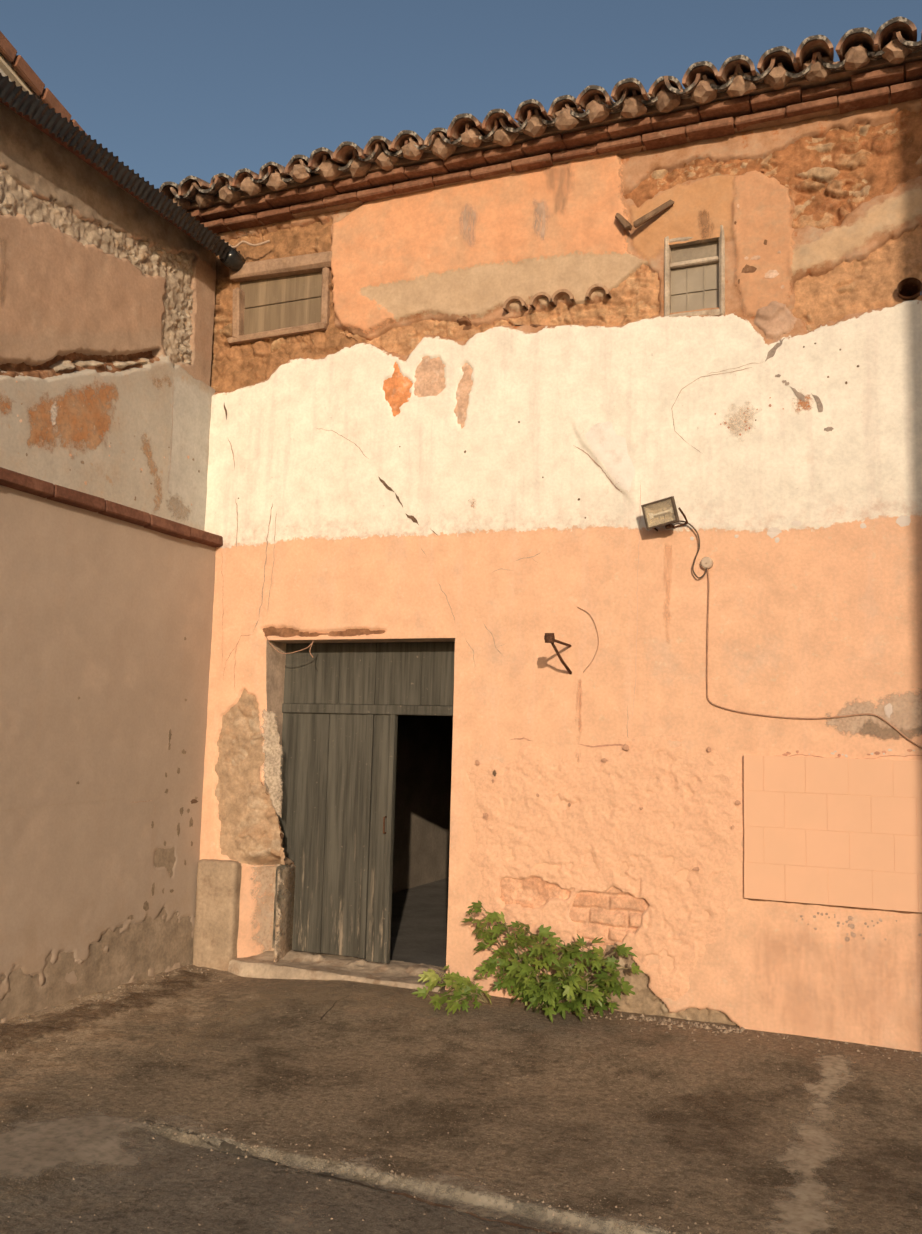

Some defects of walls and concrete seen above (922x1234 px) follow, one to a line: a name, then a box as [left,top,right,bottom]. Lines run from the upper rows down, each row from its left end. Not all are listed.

flaking render [738,240,784,289]
spalling [897,277,922,301]
flaking render [340,263,660,429]
crack [224,404,235,469]
crack [221,501,277,687]
peeling [827,691,922,755]
peeling [0,797,198,1023]
flaking render [500,878,649,947]